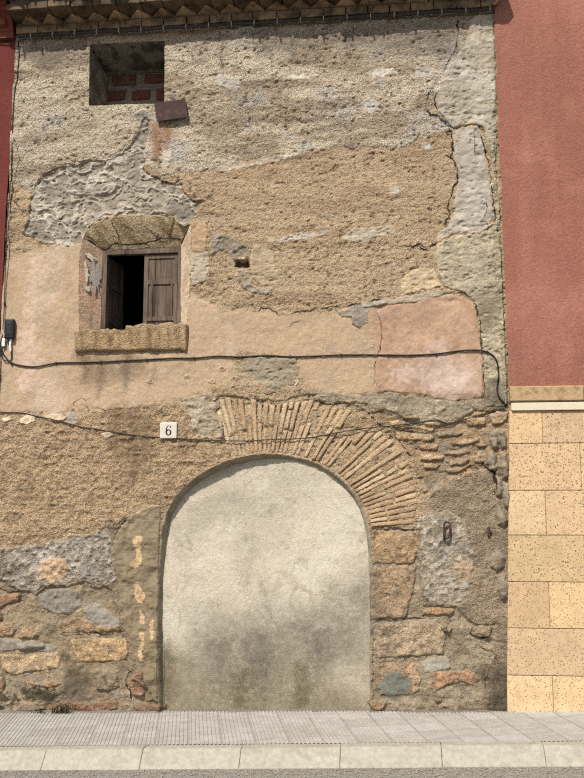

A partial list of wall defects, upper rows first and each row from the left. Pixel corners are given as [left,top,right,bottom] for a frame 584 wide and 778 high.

spalling [21,123,204,247]
flaking render [217,153,298,173]
crack [404,90,497,251]
flaking render [84,252,102,294]
flaking render [265,225,396,244]
crack [258,298,382,381]
spalling [0,528,167,711]